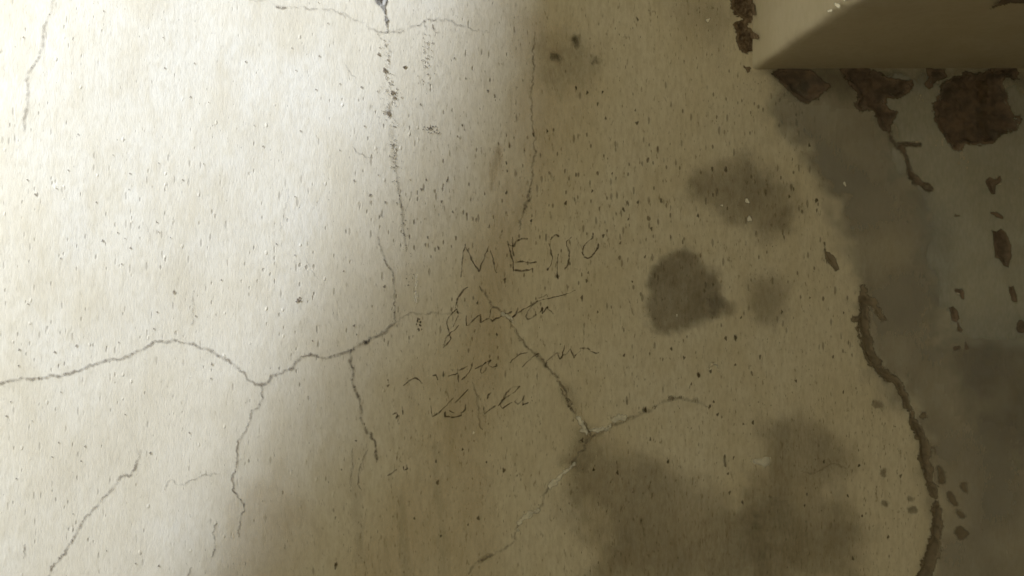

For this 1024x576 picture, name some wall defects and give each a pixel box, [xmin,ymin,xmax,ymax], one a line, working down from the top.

crack [376,0,407,167]
spalling [771,69,831,104]
flaking render [840,68,1024,350]
crack [545,364,645,435]